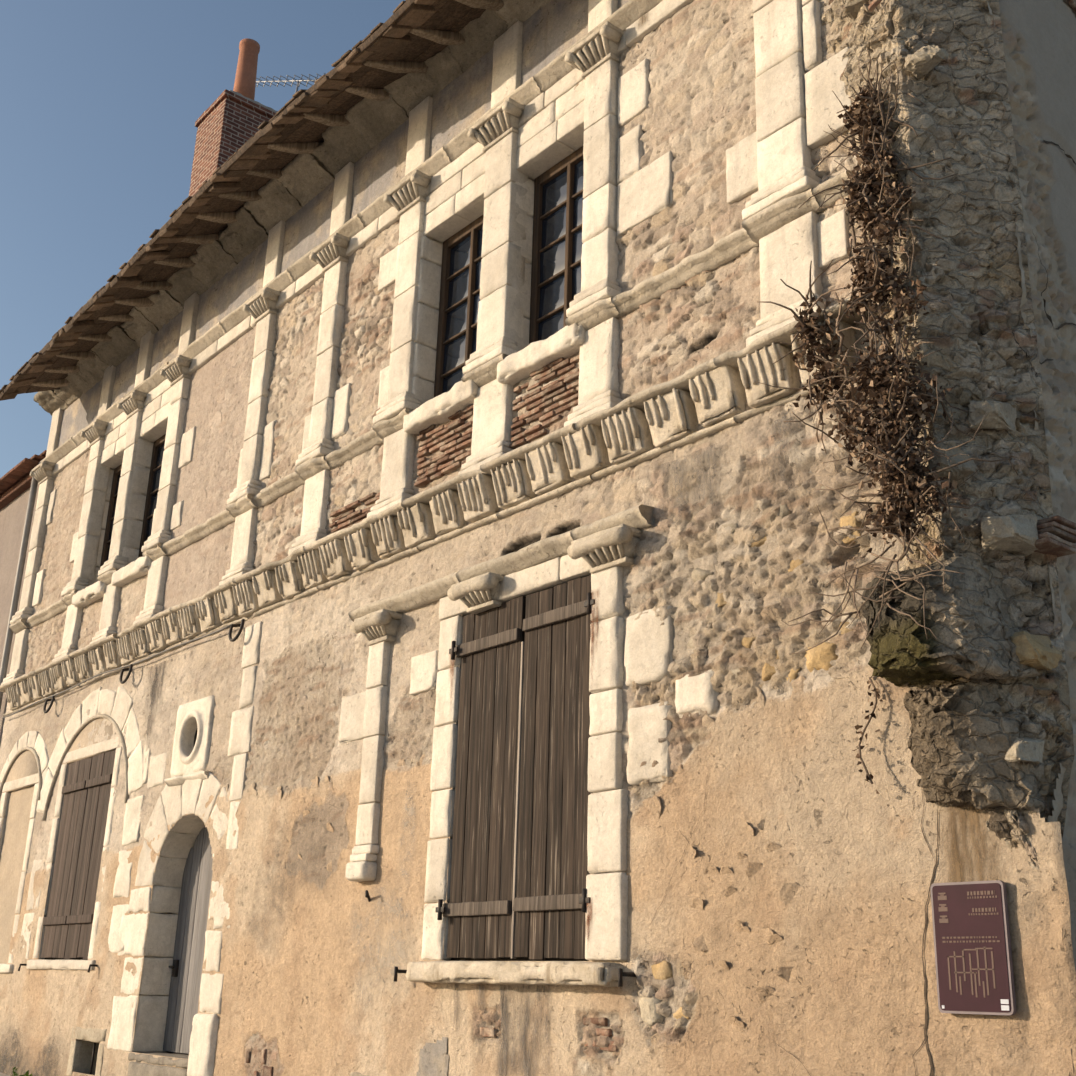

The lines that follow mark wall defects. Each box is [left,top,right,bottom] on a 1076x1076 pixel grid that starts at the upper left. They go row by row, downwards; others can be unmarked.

crack [1043,140,1076,165]
spalling [622,0,1076,869]
spalling [573,934,709,1070]
crack [912,787,938,1076]